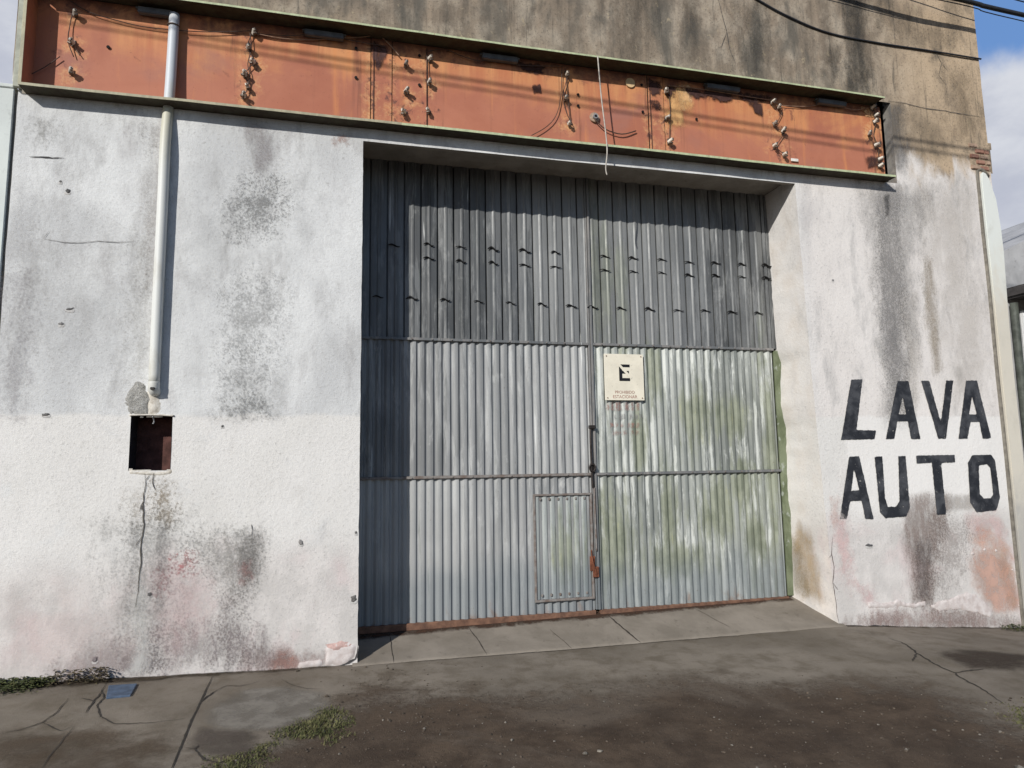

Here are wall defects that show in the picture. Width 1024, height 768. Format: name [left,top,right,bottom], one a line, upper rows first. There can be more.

rust [372,43,387,70]
rust [520,62,545,93]
rust [649,79,771,125]
crack [135,473,155,607]
crack [831,536,888,626]
flaking render [273,641,359,669]